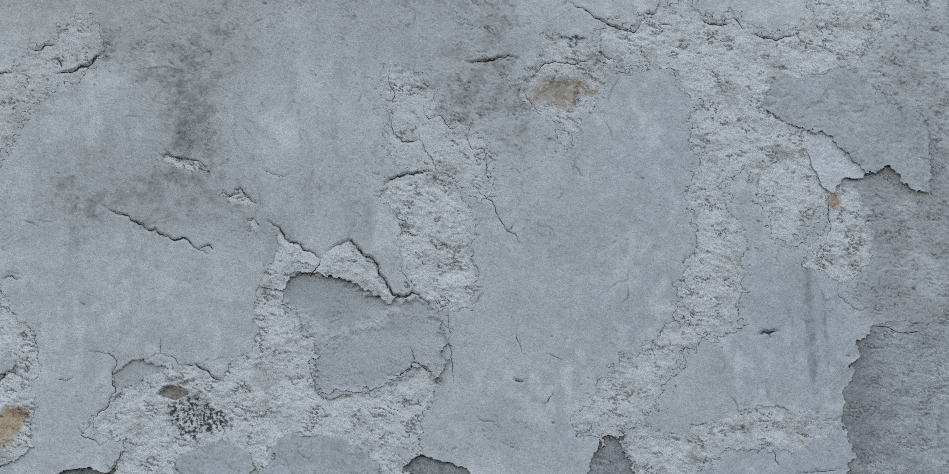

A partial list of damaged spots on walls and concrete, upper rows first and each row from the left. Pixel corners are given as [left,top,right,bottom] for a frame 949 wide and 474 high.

crack [566,1,669,34]
crack [702,18,798,41]
flaking render [0,13,108,167]
crack [523,52,616,110]
crack [108,208,212,251]
flaking render [518,0,932,474]
flaking render [0,61,506,474]